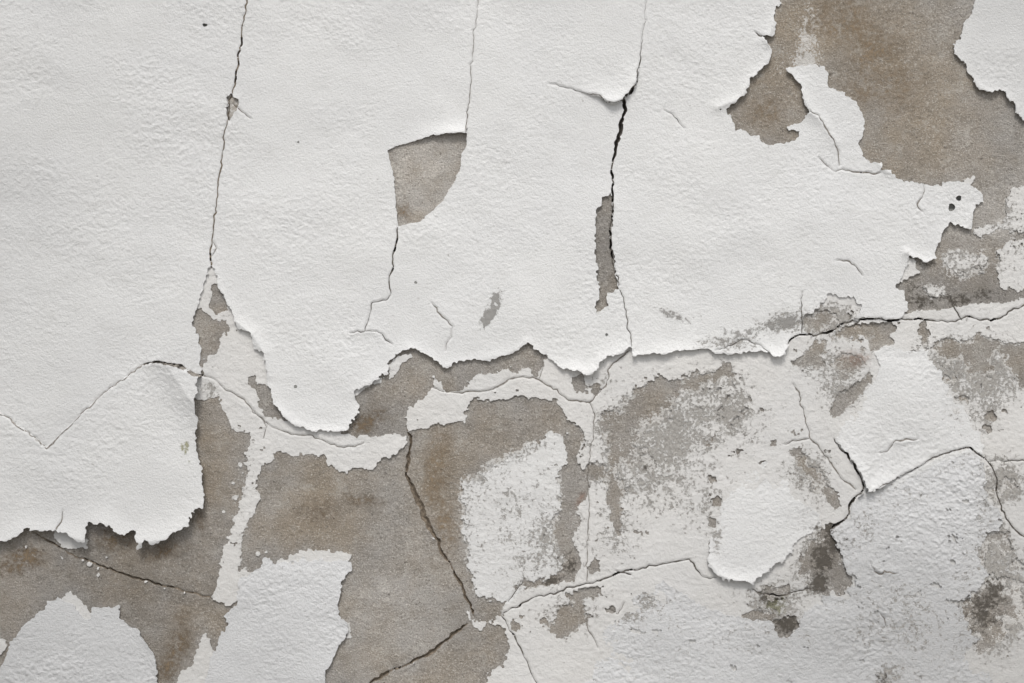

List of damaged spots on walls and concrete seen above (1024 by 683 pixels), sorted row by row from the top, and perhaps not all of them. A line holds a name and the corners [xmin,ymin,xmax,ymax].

crack [209,0,251,268]
peeling [388,103,468,226]
crack [0,361,363,449]
peeling [192,284,237,375]
crack [352,227,398,344]
peeling [0,343,764,683]
crack [369,427,475,683]
crack [432,8,717,683]
peeling [594,194,619,312]
peeling [707,0,1024,655]
crack [721,297,1024,357]
crack [784,387,1024,537]